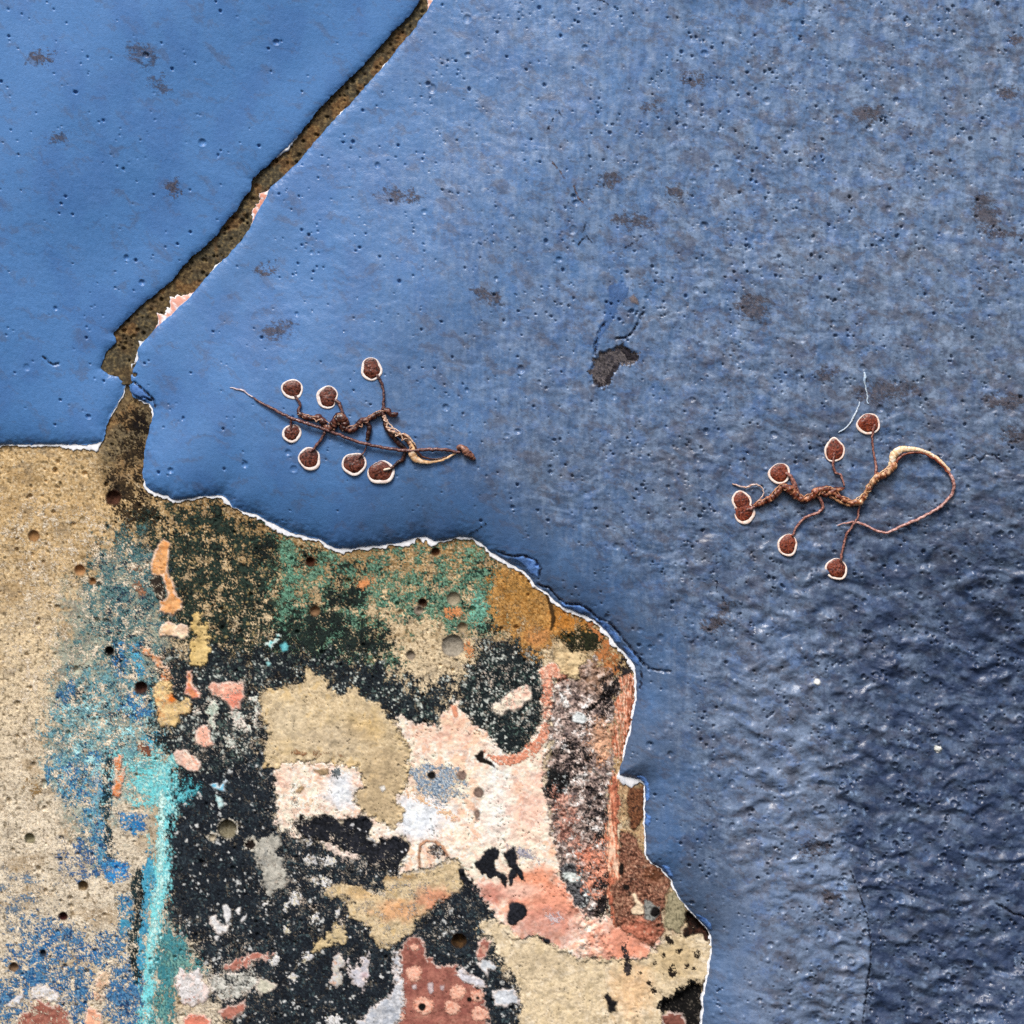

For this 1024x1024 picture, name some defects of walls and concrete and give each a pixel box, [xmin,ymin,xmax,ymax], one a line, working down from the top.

peeling [587,342,641,390]
peeling [0,384,712,1024]